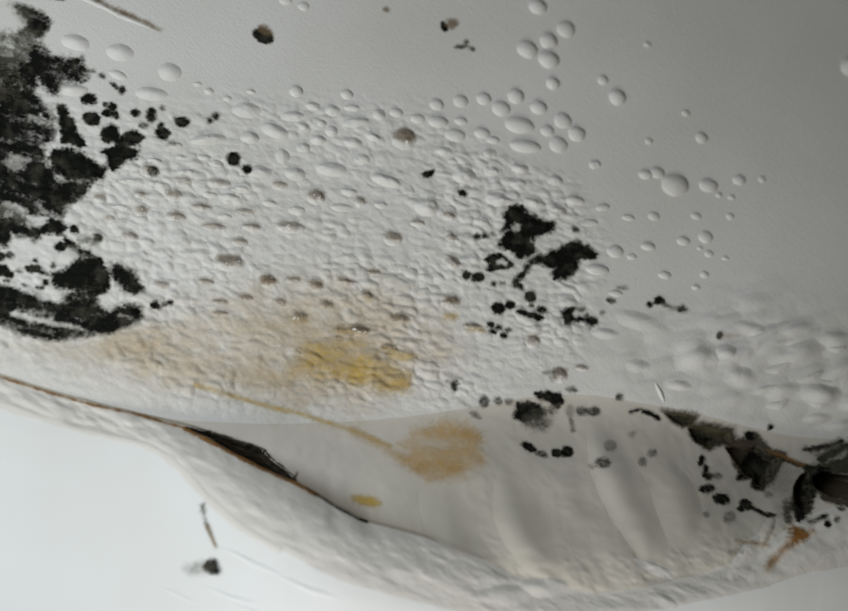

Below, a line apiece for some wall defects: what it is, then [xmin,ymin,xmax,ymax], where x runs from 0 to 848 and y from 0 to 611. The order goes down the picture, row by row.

water stain [0,4,190,341]
water stain [462,204,598,338]
water stain [296,342,410,389]
water stain [479,388,577,429]
water stain [576,407,600,416]
crack [2,377,368,523]
water stain [522,442,573,457]
water stain [689,434,713,445]
water stain [698,431,848,527]